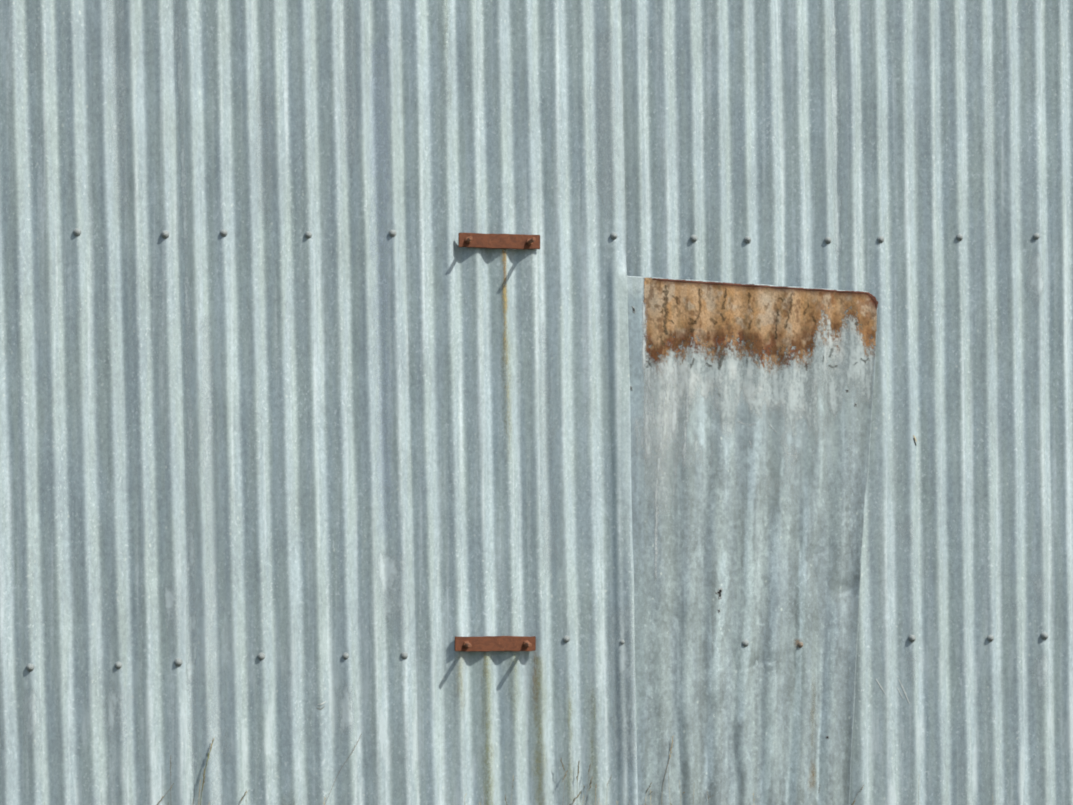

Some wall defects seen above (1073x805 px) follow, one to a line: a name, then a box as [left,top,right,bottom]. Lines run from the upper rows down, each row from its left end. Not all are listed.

corrosion [643,277,878,372]